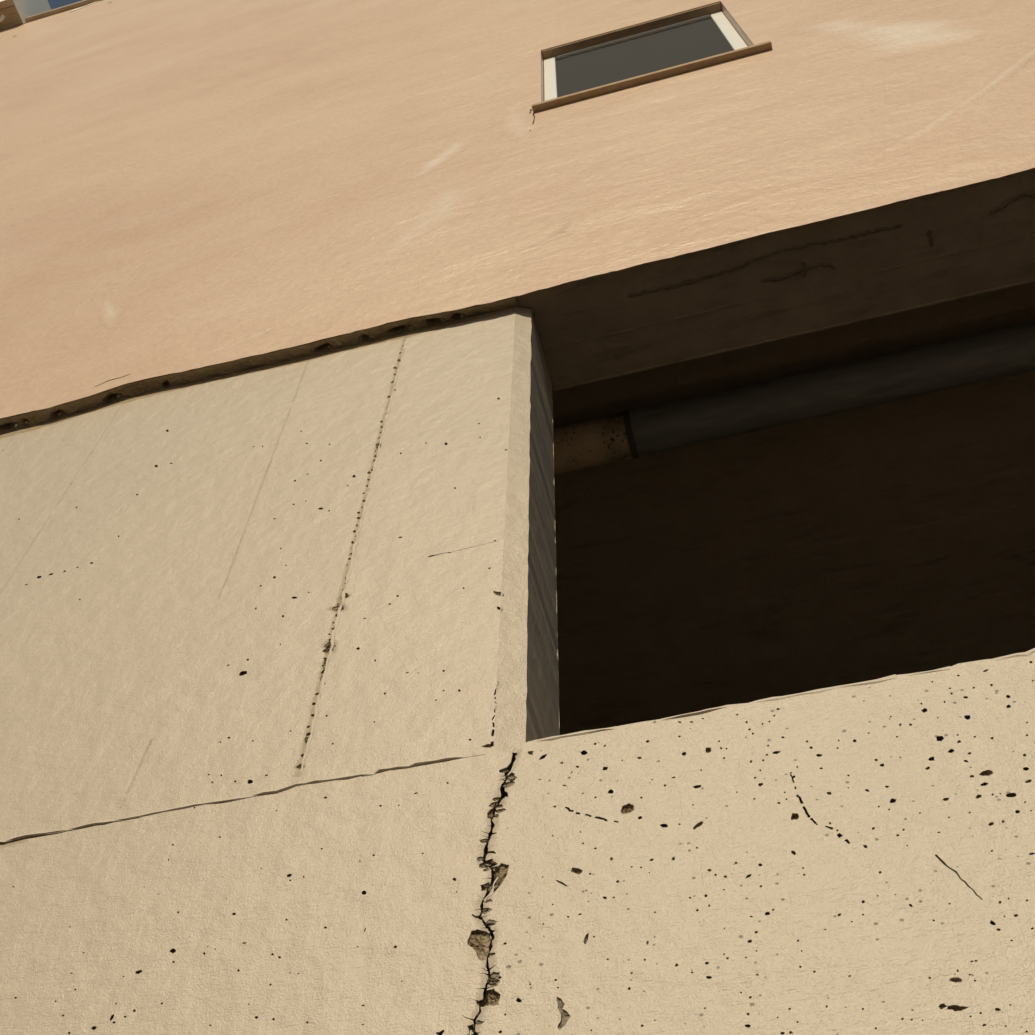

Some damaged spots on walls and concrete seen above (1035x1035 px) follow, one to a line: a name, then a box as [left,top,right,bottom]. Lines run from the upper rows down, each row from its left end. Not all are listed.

crack [627,224,902,298]
crack [565,807,619,823]
crack [790,774,850,844]
crack [0,682,518,1035]
crack [935,854,983,900]